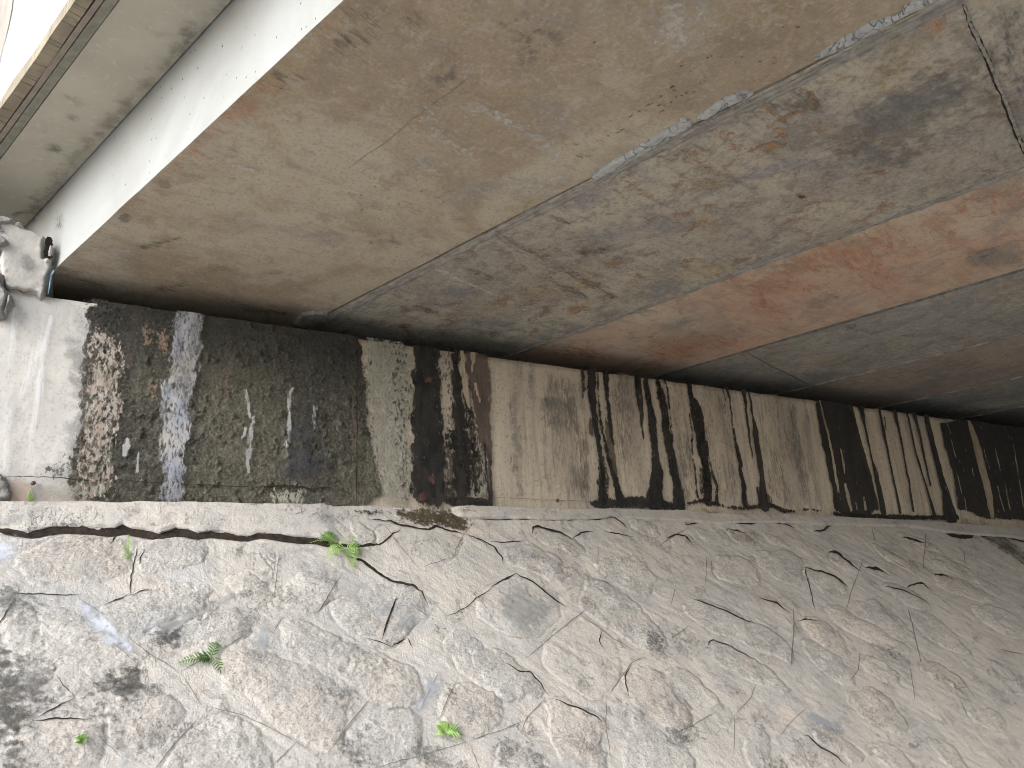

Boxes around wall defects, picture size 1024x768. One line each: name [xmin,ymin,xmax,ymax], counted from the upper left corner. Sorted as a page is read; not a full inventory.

peeling [591,89,754,179]
peeling [813,0,937,61]
crack [961,0,1024,154]
water stain [45,298,129,500]
water stain [159,310,202,498]
water stain [241,389,256,473]
water stain [362,337,493,508]
water stain [544,367,1024,524]
crack [0,497,645,768]
crack [670,639,757,741]
crack [779,710,843,763]
crack [662,522,1024,699]